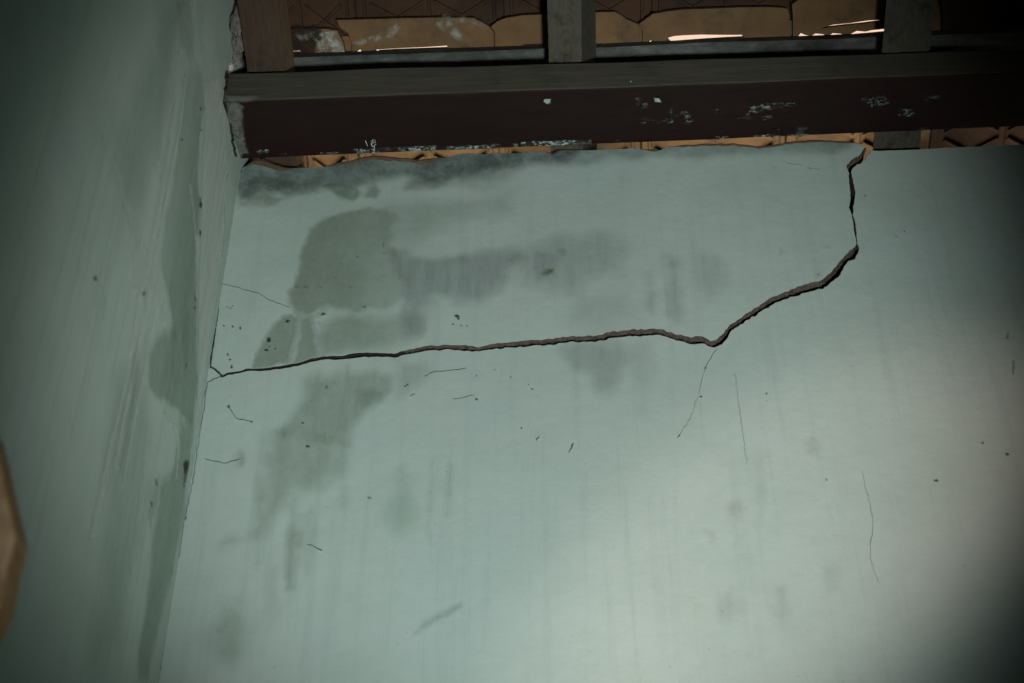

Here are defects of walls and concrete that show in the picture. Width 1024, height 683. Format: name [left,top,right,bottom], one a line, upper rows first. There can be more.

crack [178,147,871,558]